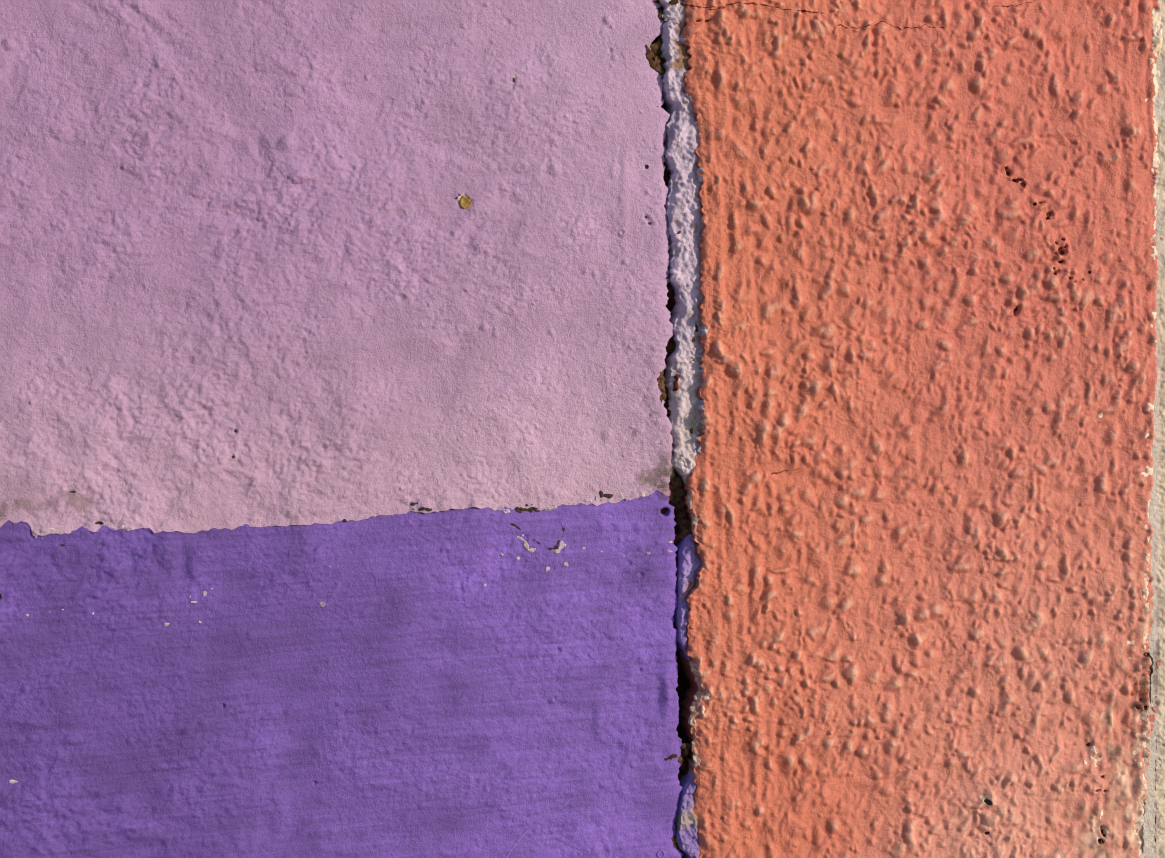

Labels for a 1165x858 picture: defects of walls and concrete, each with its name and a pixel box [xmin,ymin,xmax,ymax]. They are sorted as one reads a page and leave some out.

crack [646,0,944,110]
crack [663,155,671,209]
spalling [659,0,709,483]
crack [657,274,676,417]
peeling [498,504,569,567]
peeling [571,491,645,504]
crack [660,467,698,582]
spalling [674,534,702,661]
crack [664,616,710,785]
peeling [1127,499,1154,858]
crack [671,836,684,858]
spalling [674,758,700,858]